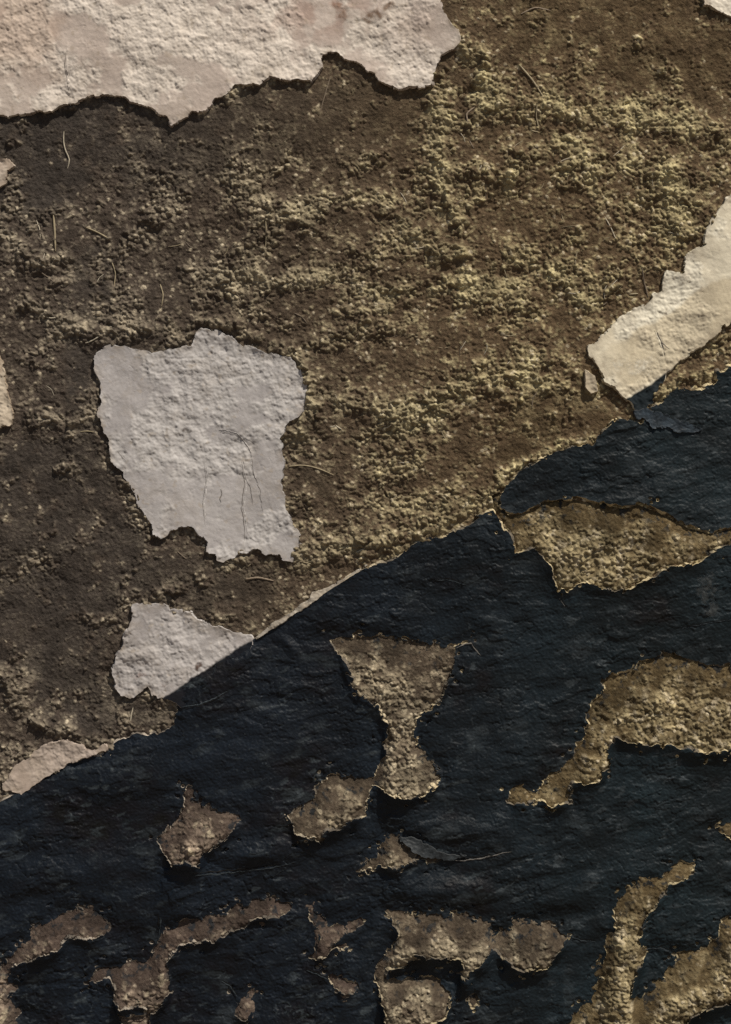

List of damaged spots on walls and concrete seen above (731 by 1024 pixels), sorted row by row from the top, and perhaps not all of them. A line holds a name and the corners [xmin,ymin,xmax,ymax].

spalling [0,0,731,813]
spalling [284,624,477,847]
spalling [149,781,241,868]
spalling [0,903,111,1024]
spalling [80,890,292,1024]
spalling [302,894,572,1024]
spalling [566,859,731,1024]